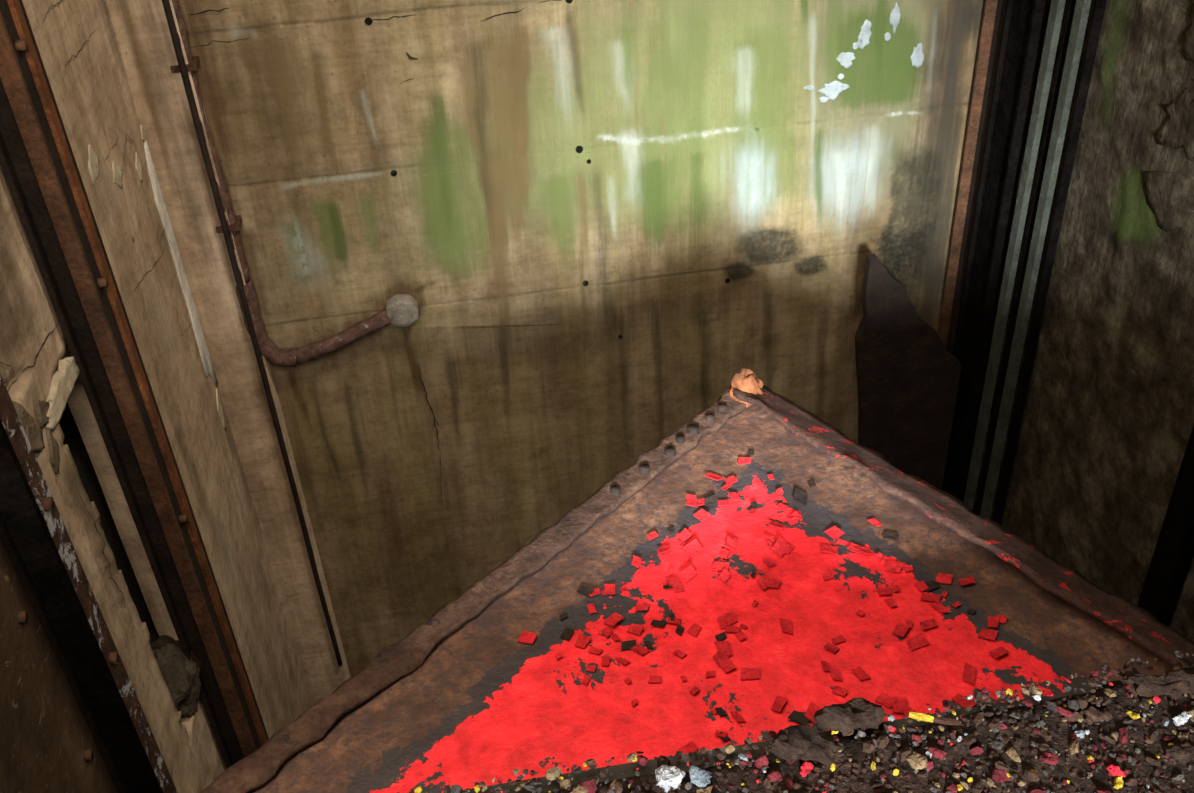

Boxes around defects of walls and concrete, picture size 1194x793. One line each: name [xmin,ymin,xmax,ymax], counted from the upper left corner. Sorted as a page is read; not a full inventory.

peeling [803,3,901,103]
peeling [911,42,924,68]
spalling [12,357,80,474]
peeling [687,451,758,522]
peeling [750,474,817,606]
peeling [820,526,1009,658]
peeling [517,631,537,644]
peeling [555,584,702,686]
peeling [680,610,760,695]
peeling [820,634,871,696]
peeling [712,706,746,742]
peeling [770,695,829,731]